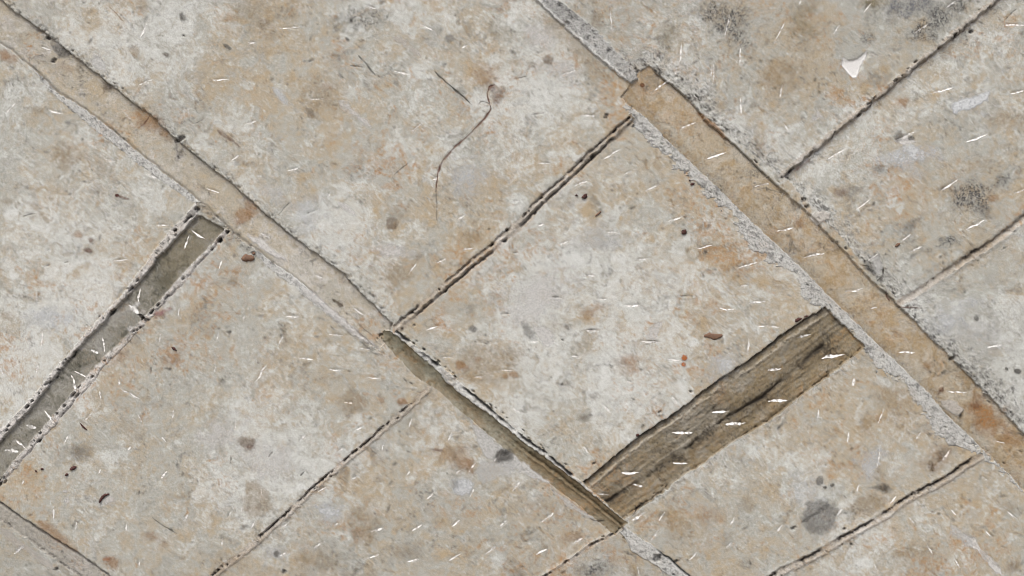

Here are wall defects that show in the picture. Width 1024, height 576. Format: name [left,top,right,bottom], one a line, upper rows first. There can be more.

spalling [842,52,867,78]
crack [435,72,495,187]
damp [954,176,1009,211]
damp [802,501,836,533]